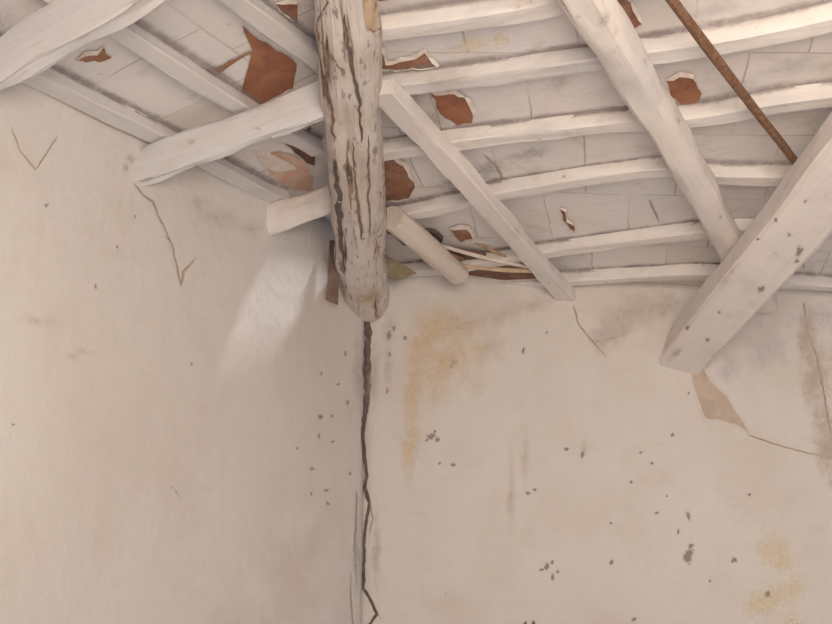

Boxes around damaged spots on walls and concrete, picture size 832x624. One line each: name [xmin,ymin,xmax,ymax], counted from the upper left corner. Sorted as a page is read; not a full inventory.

peeling [617,0,643,28]
peeling [207,26,297,104]
peeling [431,90,476,126]
peeling [666,72,702,105]
crack [11,127,58,170]
peeling [257,143,316,191]
peeling [384,159,418,203]
crack [134,184,196,285]
crack [803,303,832,435]
peeling [691,369,751,434]
crack [749,435,832,459]
crack [350,322,380,624]